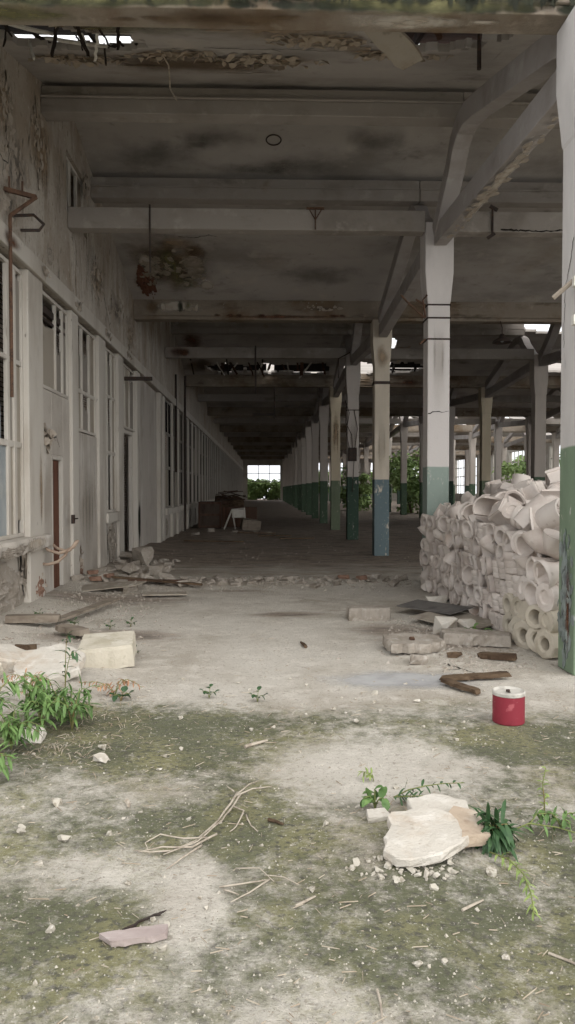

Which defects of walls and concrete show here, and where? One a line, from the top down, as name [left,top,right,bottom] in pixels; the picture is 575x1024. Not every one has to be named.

peeling [28,34,390,71]
peeling [446,117,558,238]
peeling [136,248,206,299]
flaking render [0,543,48,615]